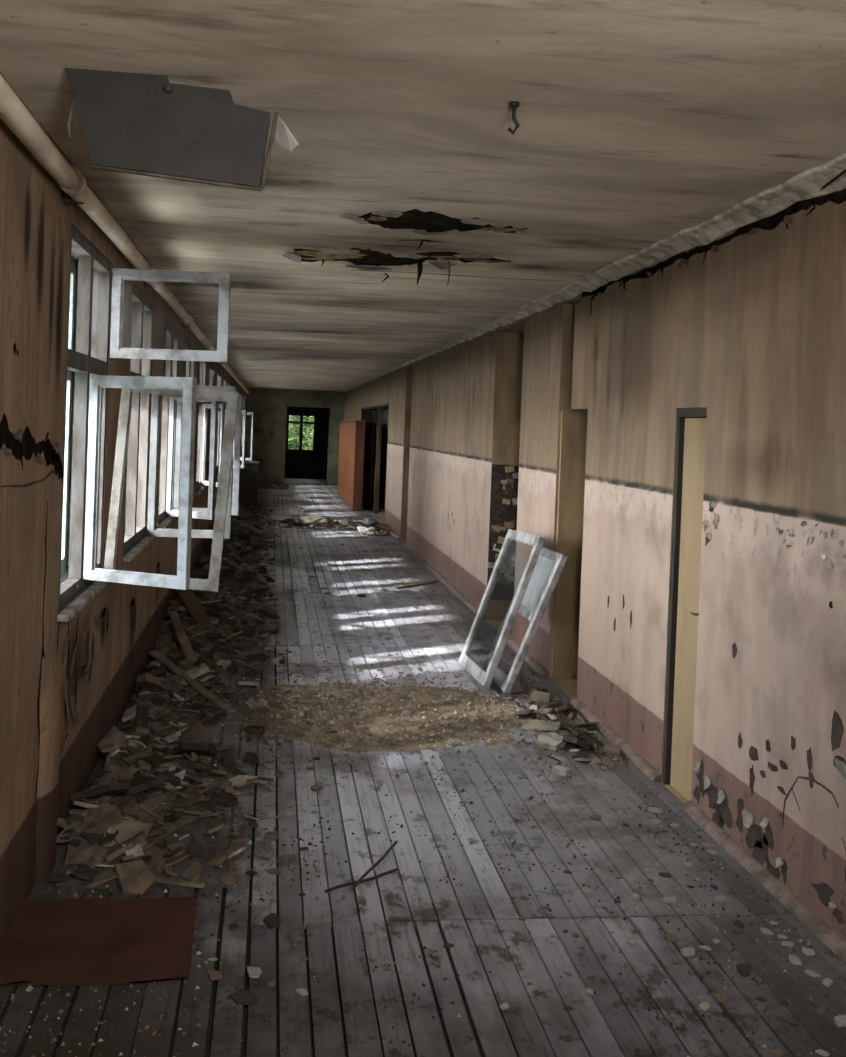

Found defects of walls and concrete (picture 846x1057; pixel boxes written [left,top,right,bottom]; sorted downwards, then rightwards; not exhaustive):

spalling [282,209,533,287]
spalling [702,501,719,546]
peeling [791,736,814,789]
peeling [831,710,846,779]
peeling [692,732,788,885]
peeling [811,882,845,924]